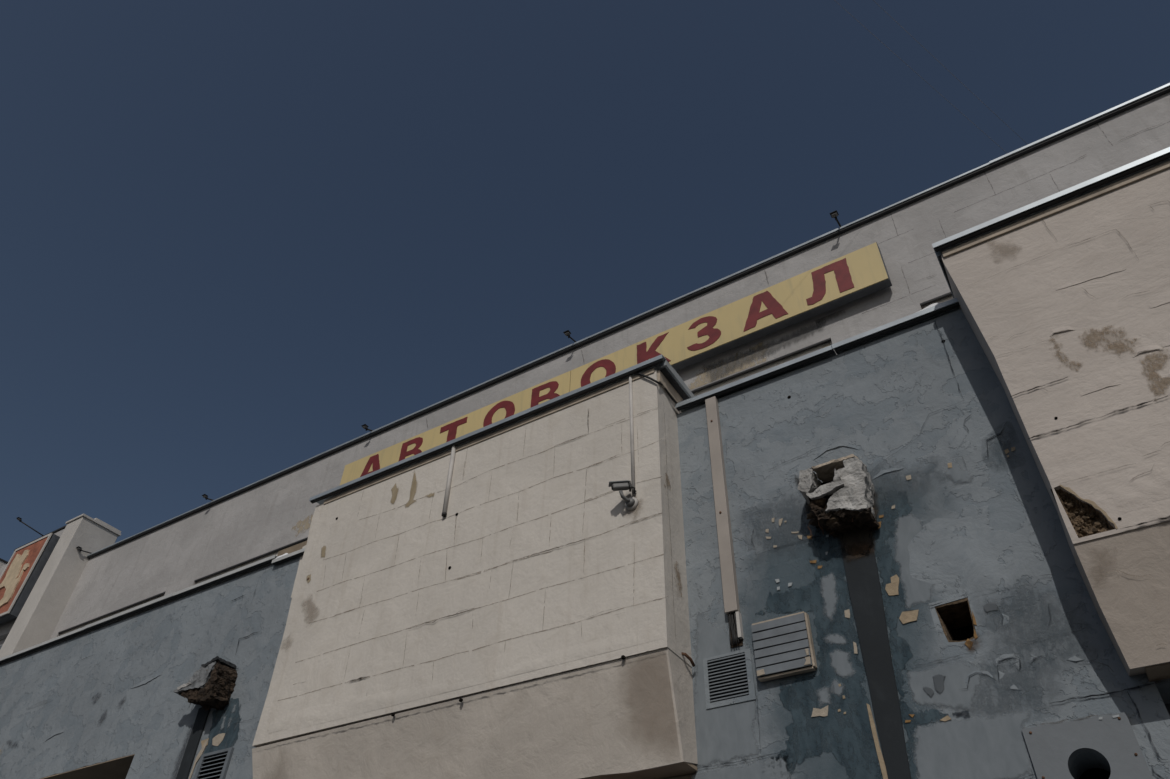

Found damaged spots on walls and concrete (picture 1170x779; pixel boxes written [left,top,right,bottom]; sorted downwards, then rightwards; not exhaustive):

peeling [689,323,820,390]
crack [935,322,969,431]
peeling [1050,326,1170,400]
crack [1028,396,1168,439]
spalling [1050,484,1117,538]
peeling [752,498,882,779]
peeling [693,614,765,766]